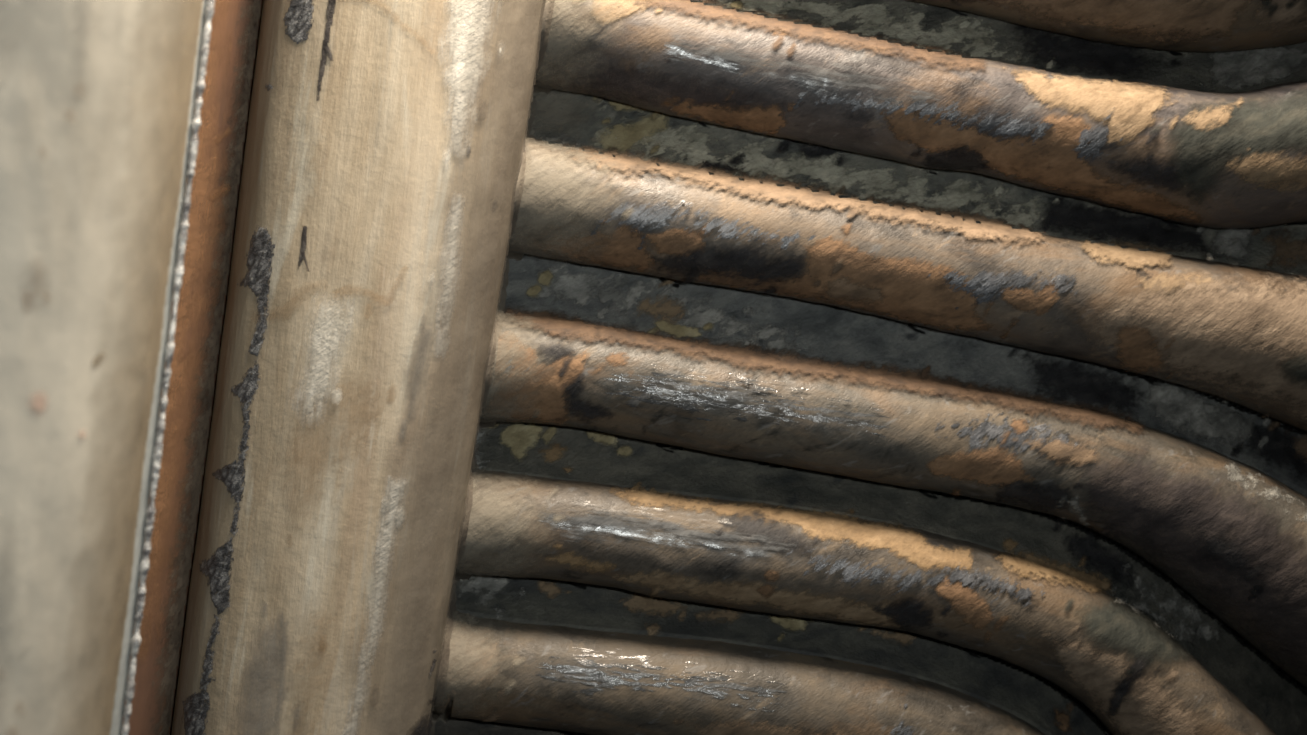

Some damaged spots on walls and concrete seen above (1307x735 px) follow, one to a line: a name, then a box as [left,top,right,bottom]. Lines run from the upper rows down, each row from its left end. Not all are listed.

peeling [283,0,314,44]
crack [316,0,336,101]
rust [635,0,985,71]
rust [662,92,795,135]
rust [880,106,1202,223]
rust [139,0,228,651]
peeling [182,227,275,735]
rust [614,572,900,628]
rust [936,577,1008,640]